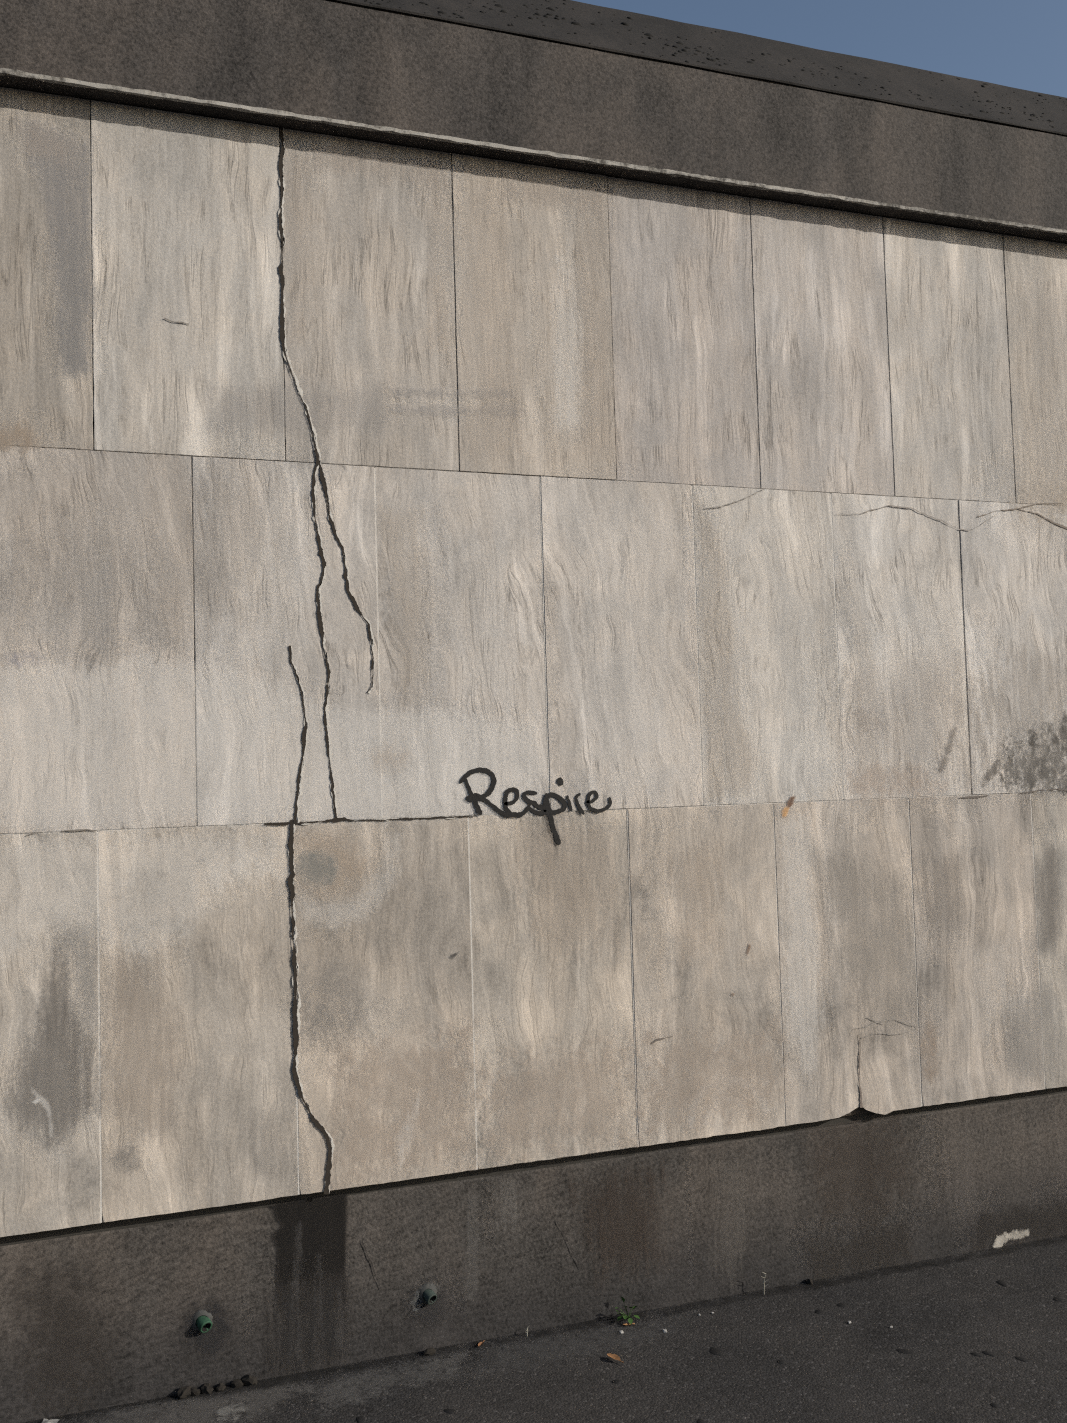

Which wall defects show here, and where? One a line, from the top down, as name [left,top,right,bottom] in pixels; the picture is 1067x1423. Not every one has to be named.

crack [705,489,764,509]
crack [845,503,1067,531]
crack [264,126,476,1194]
damp [266,1193,350,1376]